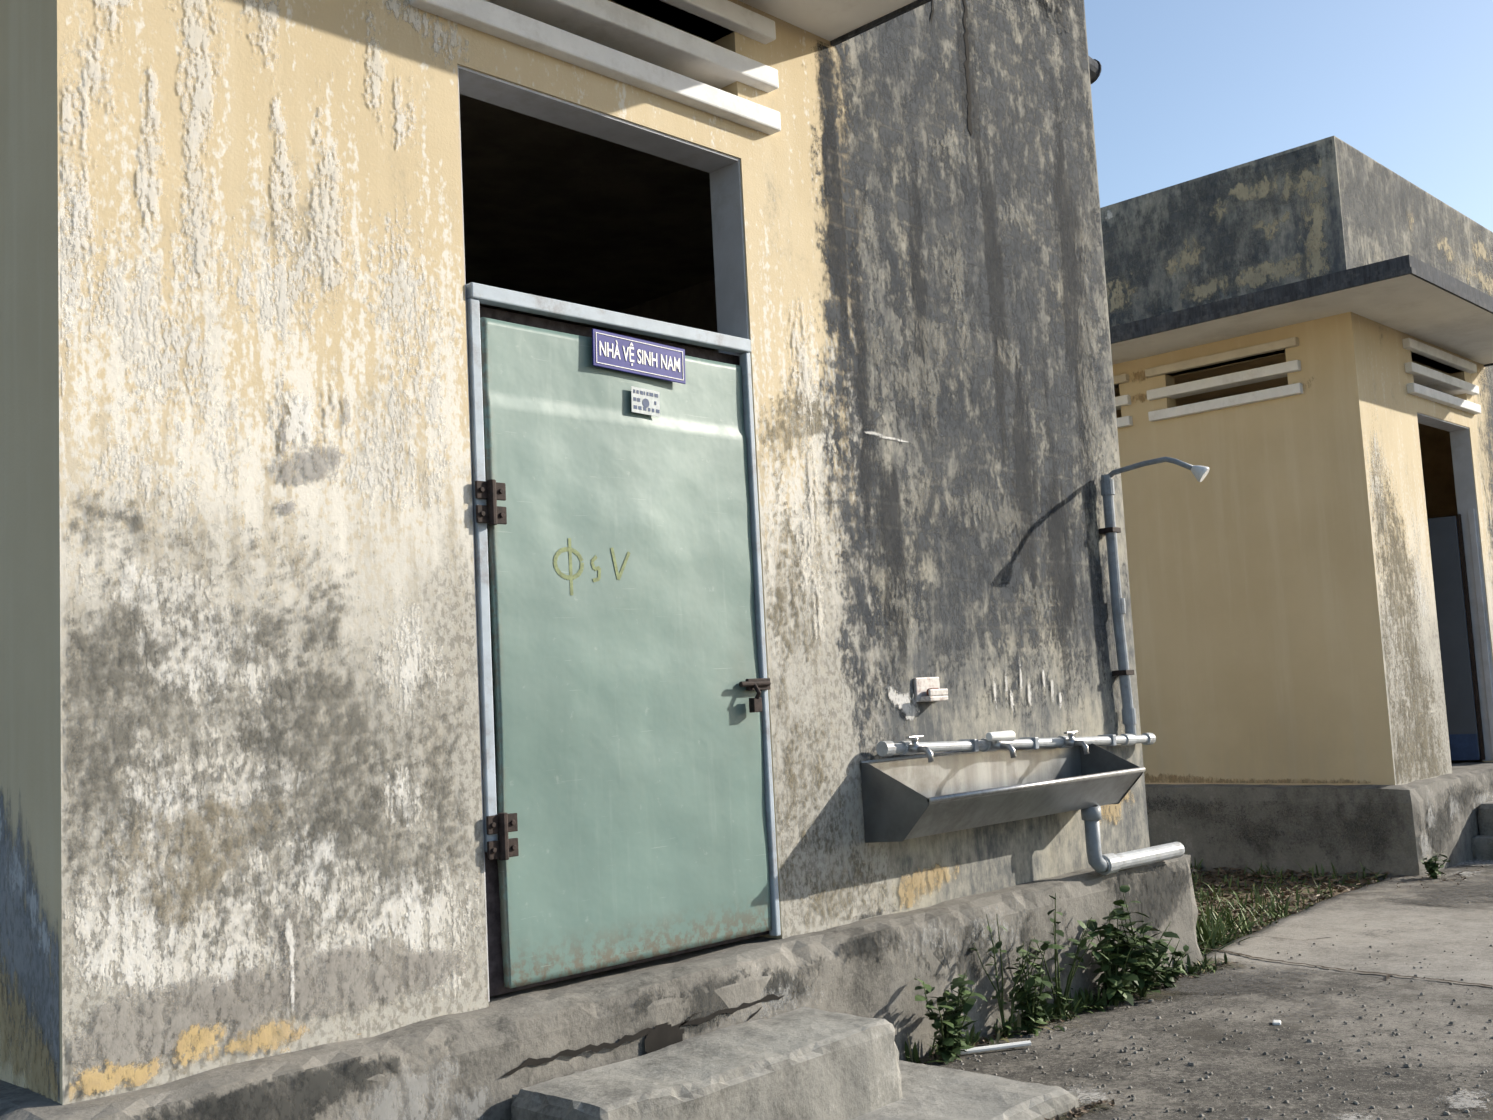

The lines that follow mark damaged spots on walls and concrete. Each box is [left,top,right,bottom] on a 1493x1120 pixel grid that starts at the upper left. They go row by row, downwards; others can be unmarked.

peeling [61,0,479,998]
damp [761,0,1493,983]
damp [0,491,484,1102]
crack [502,994,784,1077]
damp [616,957,824,1032]
damp [1149,967,1365,1019]
damp [144,1037,488,1120]